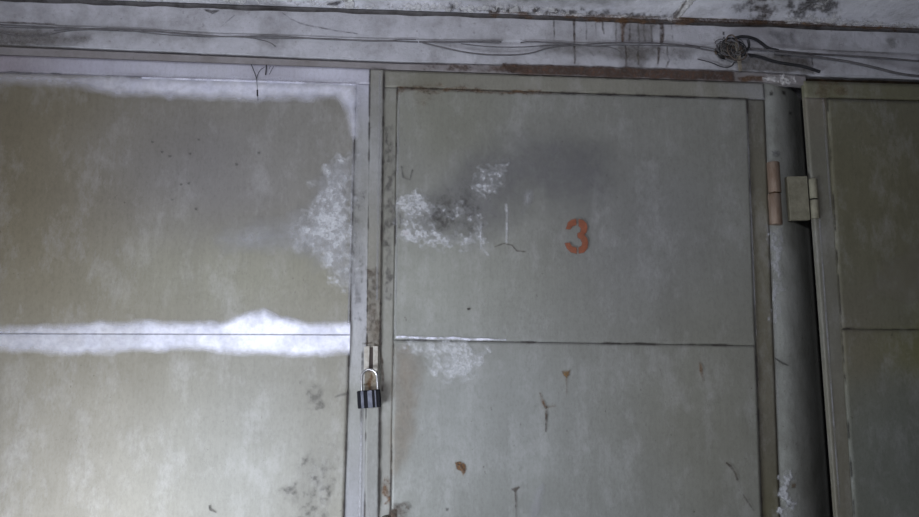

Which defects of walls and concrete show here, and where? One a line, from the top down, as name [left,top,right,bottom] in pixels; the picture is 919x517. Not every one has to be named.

water stain [405,3,577,48]
rust [492,64,796,85]